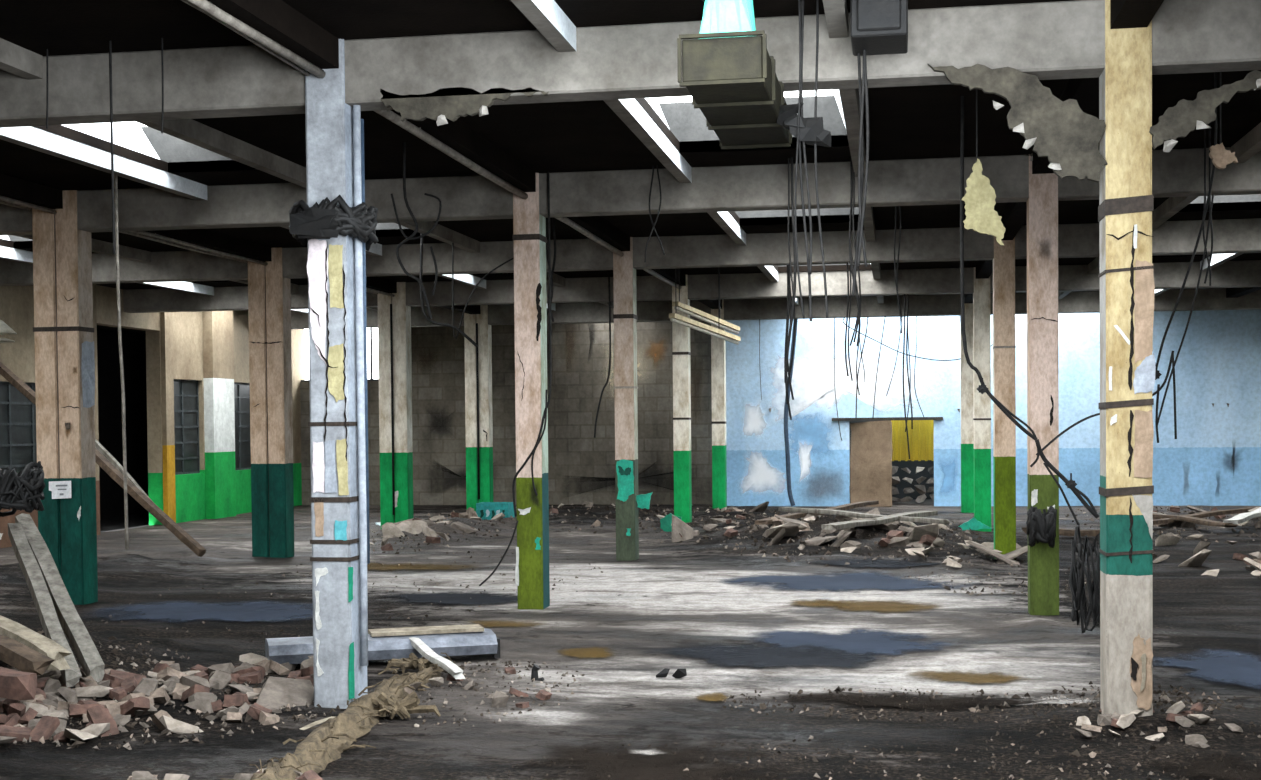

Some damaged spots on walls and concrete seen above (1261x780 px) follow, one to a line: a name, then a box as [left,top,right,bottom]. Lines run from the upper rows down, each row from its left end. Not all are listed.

spalling [380,87,548,126]
spalling [928,64,1108,183]
spalling [1149,70,1261,152]
crack [1106,226,1154,477]
peeling [744,407,771,433]
peeling [616,459,634,502]
peeling [744,455,781,490]
peeling [800,447,811,477]